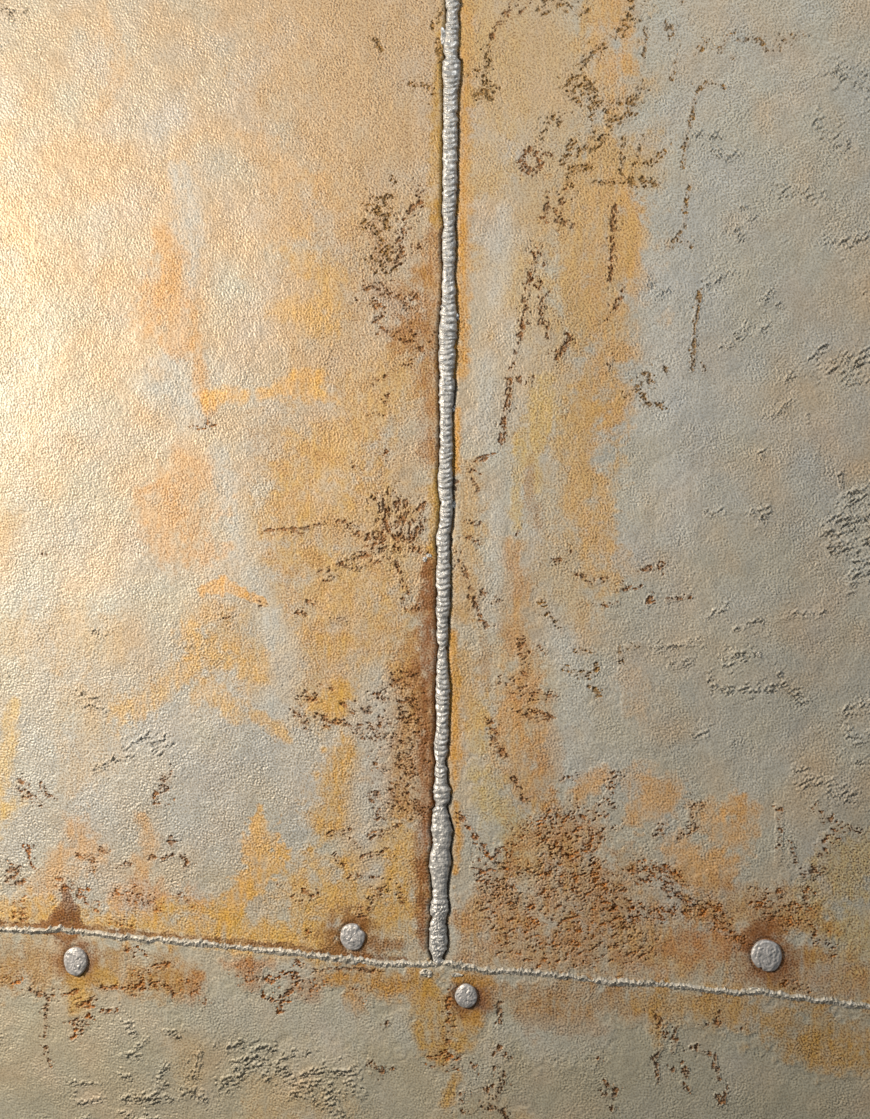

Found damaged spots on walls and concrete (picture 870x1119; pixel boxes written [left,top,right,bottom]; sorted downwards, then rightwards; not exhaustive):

corrosion [0,0,447,1019]
corrosion [445,0,682,892]
corrosion [284,753,870,1119]